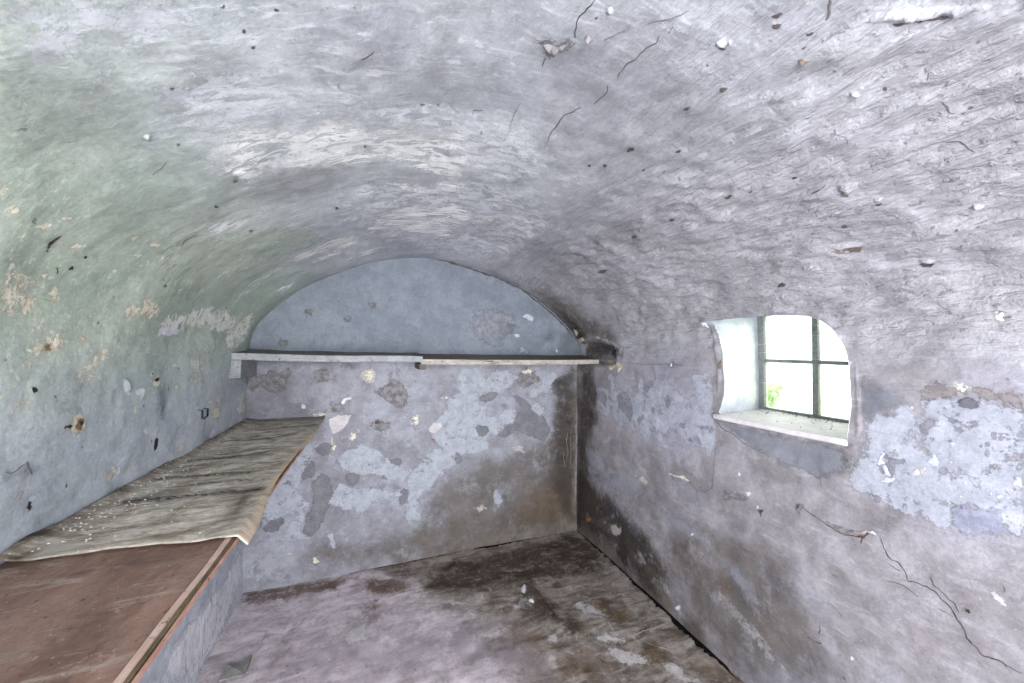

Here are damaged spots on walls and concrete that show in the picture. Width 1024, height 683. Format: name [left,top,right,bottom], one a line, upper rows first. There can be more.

spalling [539,35,593,59]
crack [574,0,595,35]
crack [543,10,689,150]
peeling [0,264,61,320]
peeling [260,365,558,552]
damp [391,373,666,635]
peeling [847,395,1024,538]
crack [805,510,1022,674]